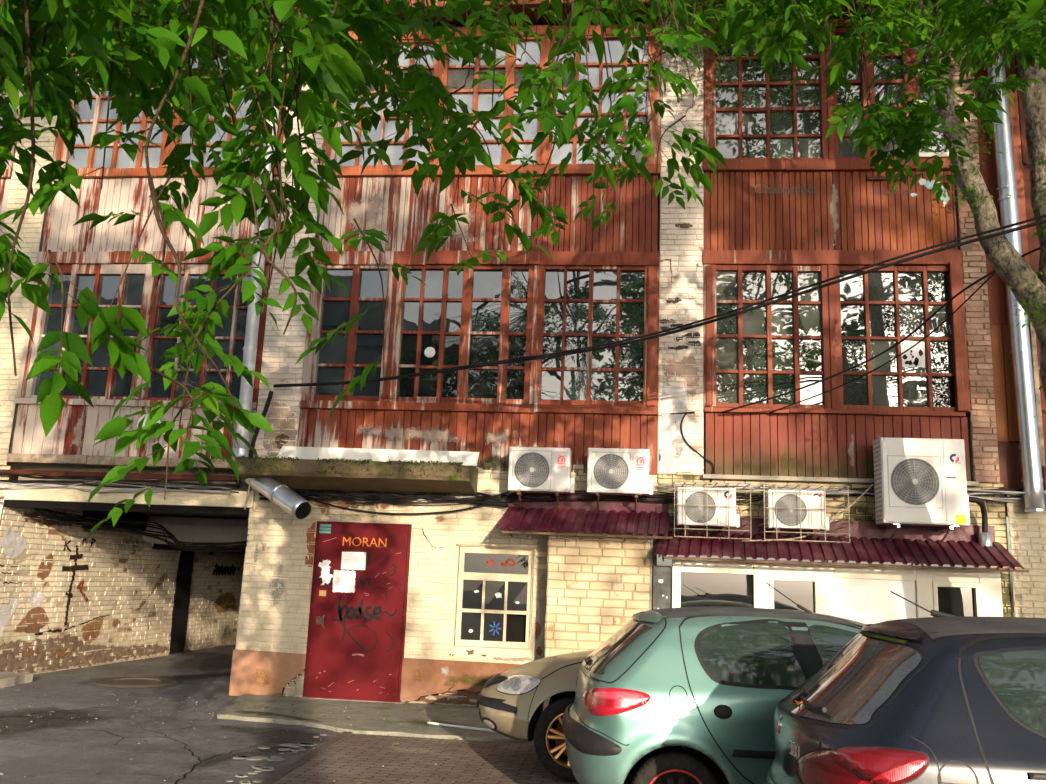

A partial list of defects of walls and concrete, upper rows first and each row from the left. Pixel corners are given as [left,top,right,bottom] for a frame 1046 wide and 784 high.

peeling [830,183,839,246]
peeling [659,319,701,395]
peeling [357,427,457,443]
peeling [485,430,516,447]
peeling [37,554,53,582]
spalling [0,607,170,673]
crack [0,706,274,784]